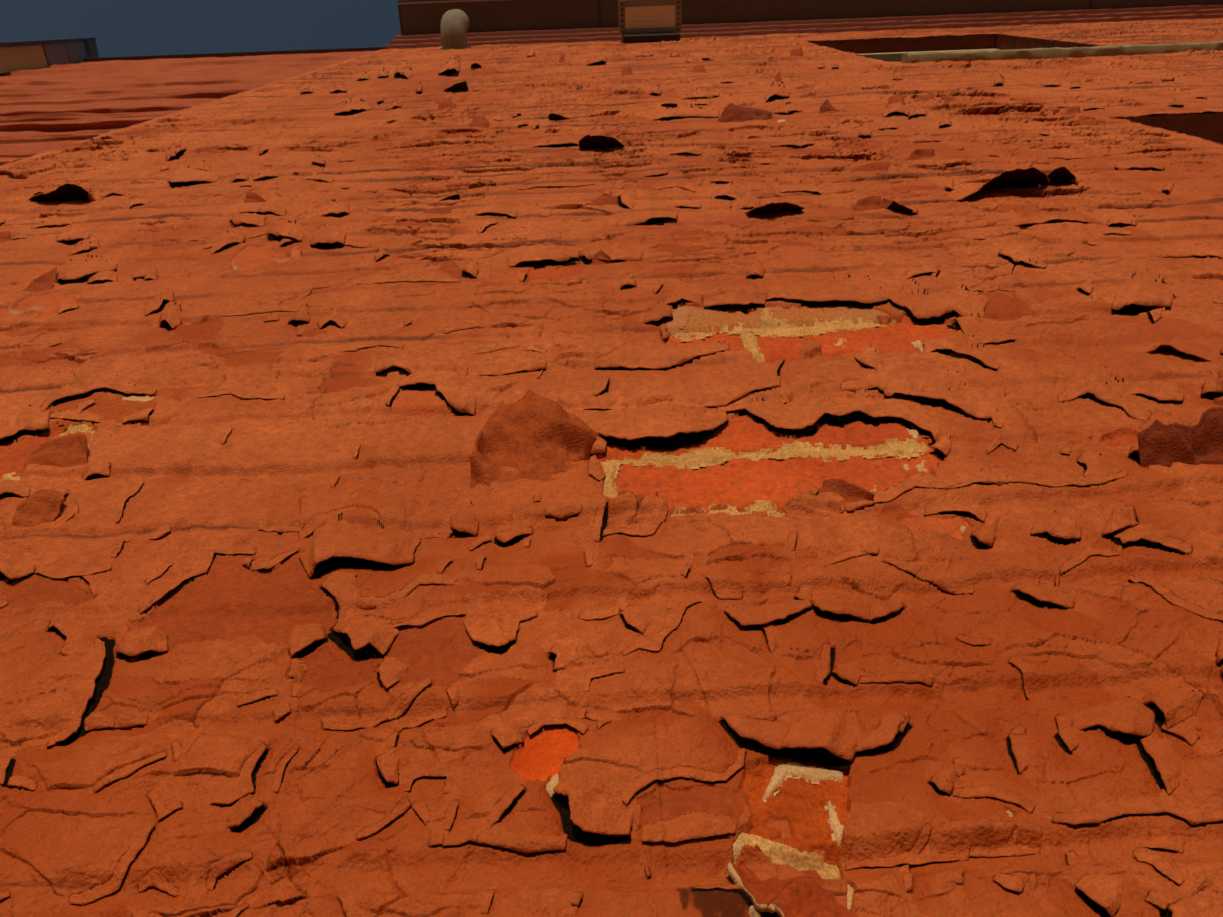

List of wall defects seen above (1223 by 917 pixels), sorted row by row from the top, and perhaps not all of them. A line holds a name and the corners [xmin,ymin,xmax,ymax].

flaking render [0,374,157,480]
crack [82,451,173,584]
peeling [46,512,537,749]
crack [358,493,609,610]
flaking render [385,274,1034,538]
crack [680,530,975,688]
crack [841,339,1223,682]
crack [70,743,300,917]
crack [321,676,460,848]
flaking render [440,710,912,917]
crack [642,811,744,895]
crack [845,715,1223,917]